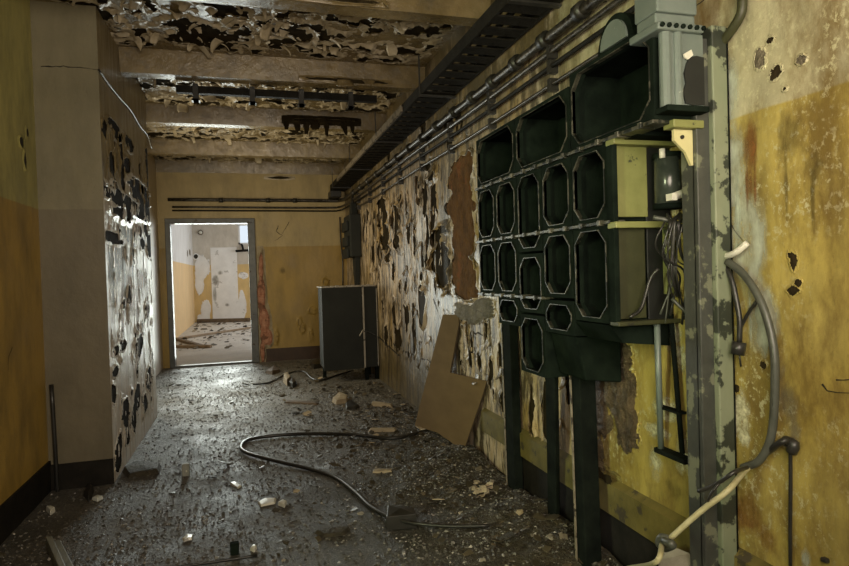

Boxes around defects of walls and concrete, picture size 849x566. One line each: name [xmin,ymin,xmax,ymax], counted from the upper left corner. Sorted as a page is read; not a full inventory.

peeling [51,0,455,65]
flaking render [753,34,790,93]
flaking render [795,52,810,67]
peeling [101,75,400,475]
flaking render [362,94,504,415]
flaking render [784,249,804,300]
peeling [597,343,642,485]